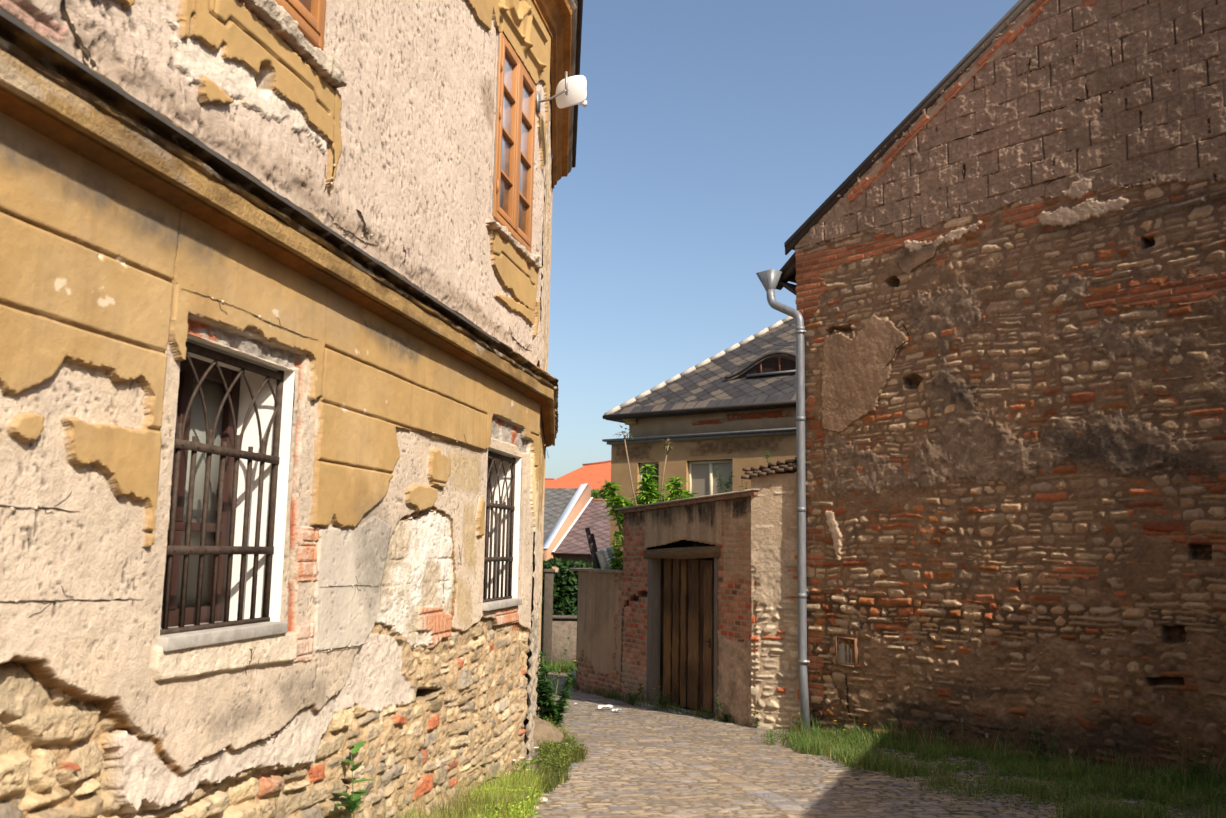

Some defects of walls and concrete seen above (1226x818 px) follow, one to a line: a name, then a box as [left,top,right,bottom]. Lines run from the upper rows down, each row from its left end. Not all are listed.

spalling [0,0,69,41]
flaking render [195,0,336,141]
flaking render [539,112,547,166]
spalling [977,200,1045,231]
spalling [795,228,952,315]
flaking render [821,314,909,432]
crack [0,492,76,513]
flaking render [0,215,542,818]
crack [0,584,141,616]